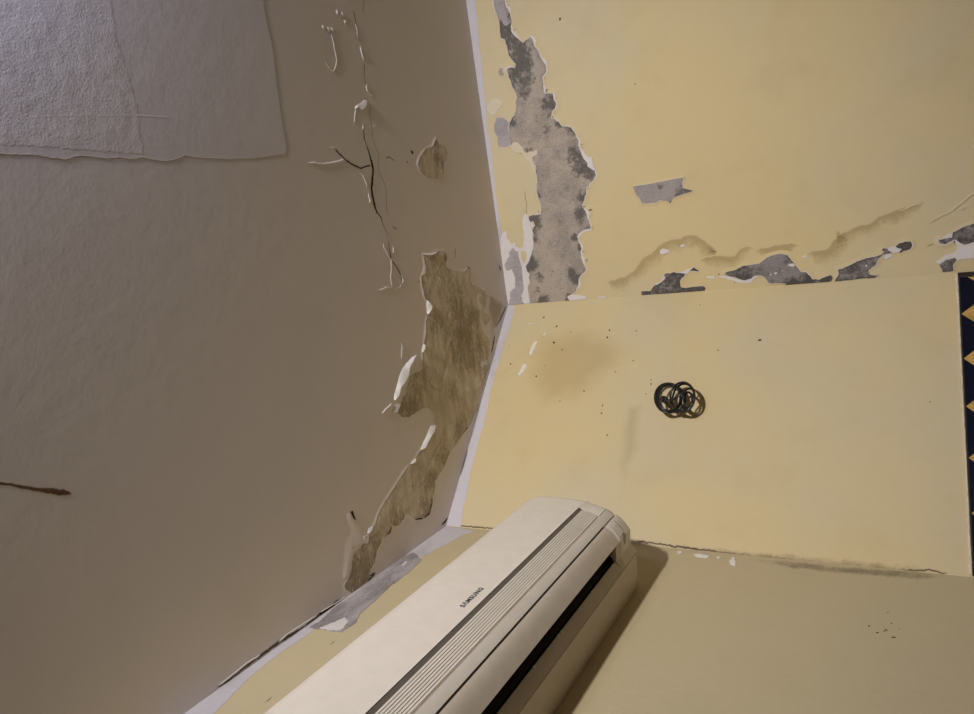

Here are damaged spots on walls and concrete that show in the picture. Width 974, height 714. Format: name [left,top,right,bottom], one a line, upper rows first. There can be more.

peeling [0,0,287,162]
crack [308,0,403,291]
peeling [407,136,449,181]
flaking render [489,0,606,305]
peeling [631,175,696,206]
flaking render [639,238,917,295]
flaking render [933,219,974,273]
peeling [309,248,491,632]
corrosion [0,482,71,495]
crack [638,540,805,561]
crack [906,567,946,575]